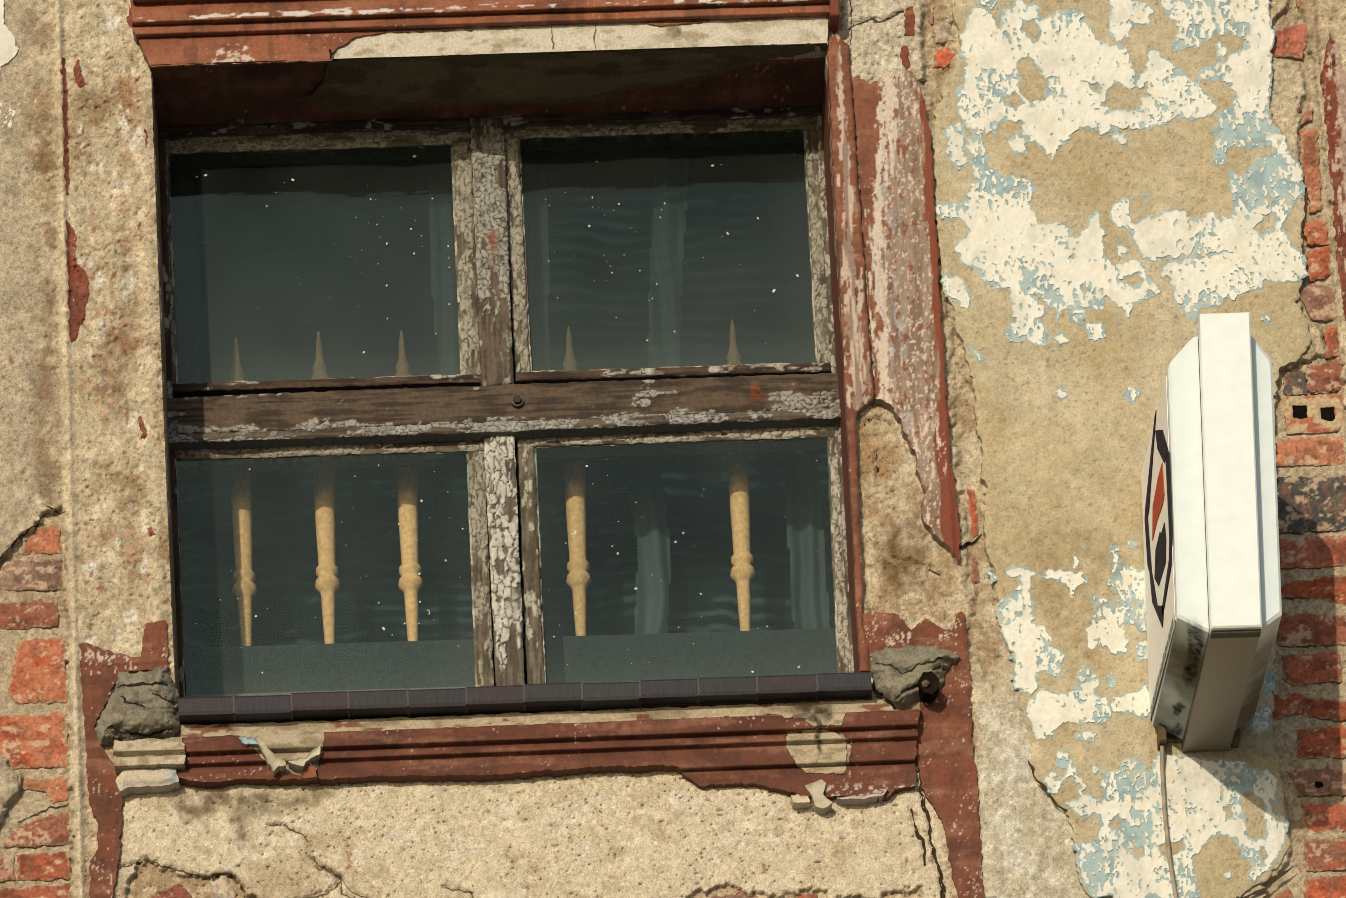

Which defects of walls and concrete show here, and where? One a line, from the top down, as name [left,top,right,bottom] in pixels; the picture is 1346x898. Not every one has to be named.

peeling [0,0,18,72]
peeling [60,57,86,195]
peeling [66,220,89,342]
peeling [900,0,1346,898]
flaking render [860,406,953,623]
flaking render [0,525,72,898]
crack [120,857,245,895]
crack [269,824,367,898]
flaking render [711,889,756,898]
crack [910,771,946,898]